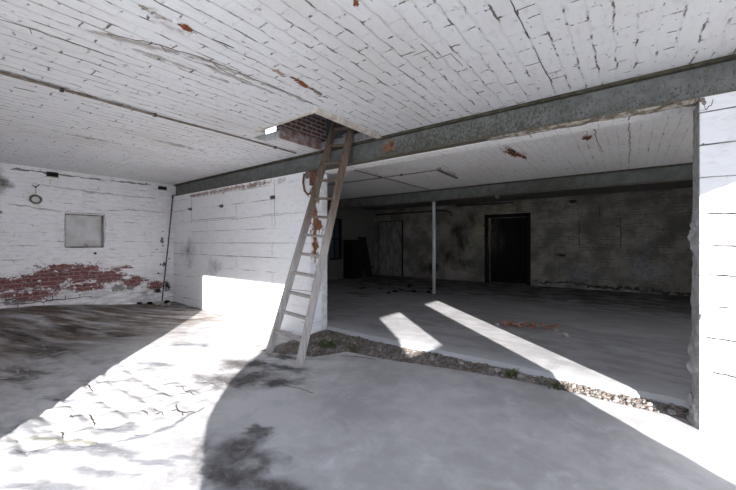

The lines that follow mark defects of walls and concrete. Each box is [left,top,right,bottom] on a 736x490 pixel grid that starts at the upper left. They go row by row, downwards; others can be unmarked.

crack [510,0,561,88]
rust [308,186,324,273]
peeling [0,252,170,302]
crack [141,385,194,416]